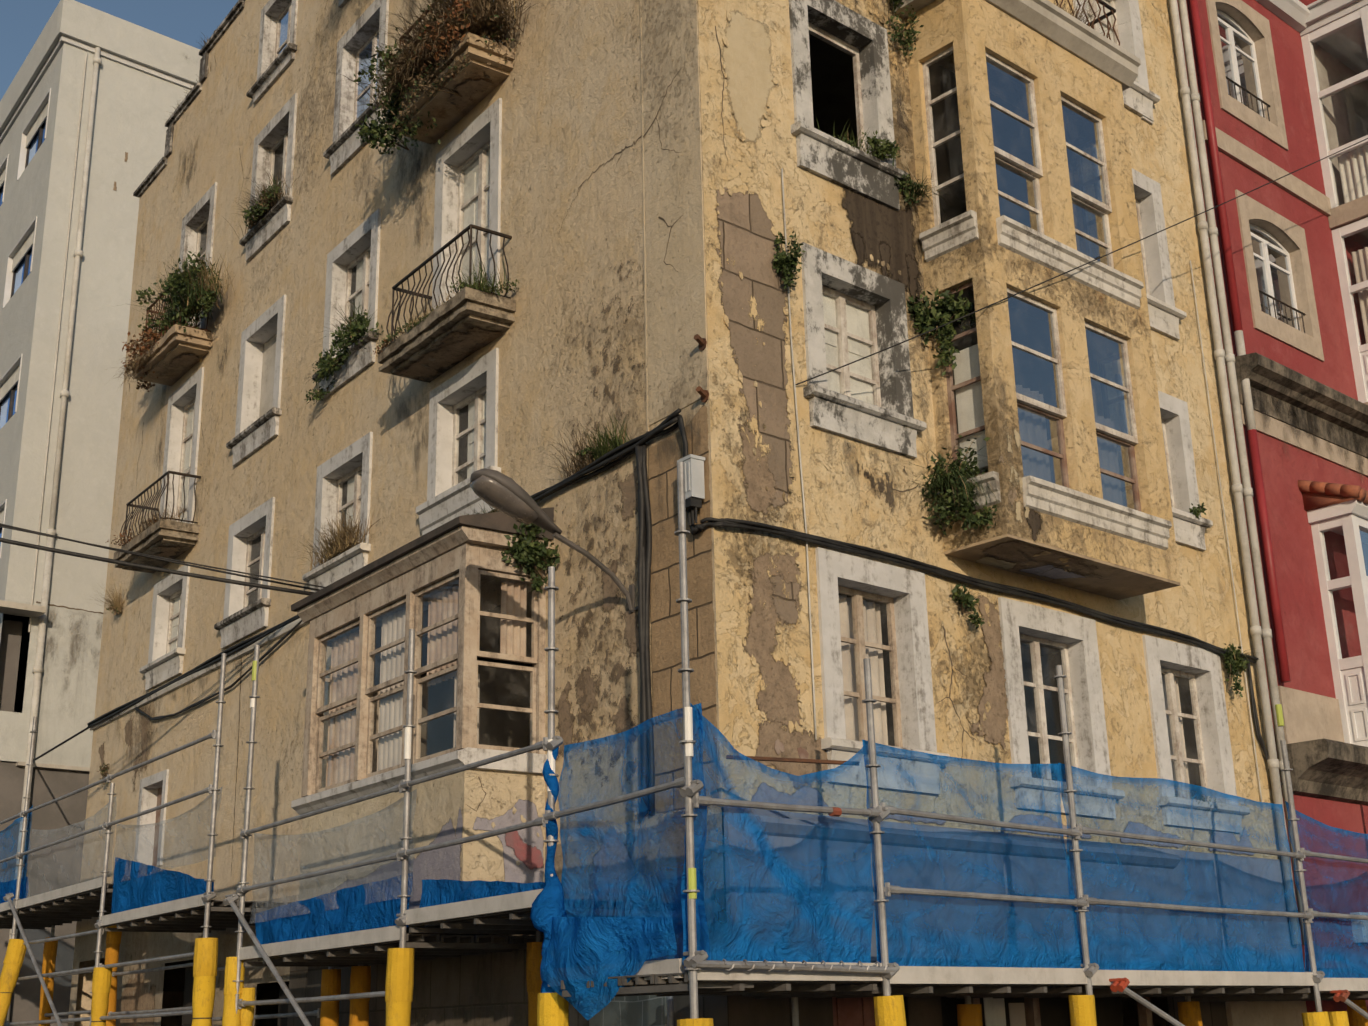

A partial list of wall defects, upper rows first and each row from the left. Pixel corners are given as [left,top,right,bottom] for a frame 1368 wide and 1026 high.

crack [559,70,680,232]
crack [715,26,728,160]
crack [658,217,678,272]
peeling [715,187,796,522]
peeling [742,552,834,807]
crack [935,626,976,768]
peeling [330,799,544,909]
peeling [1120,821,1185,848]
peeling [1209,827,1255,855]